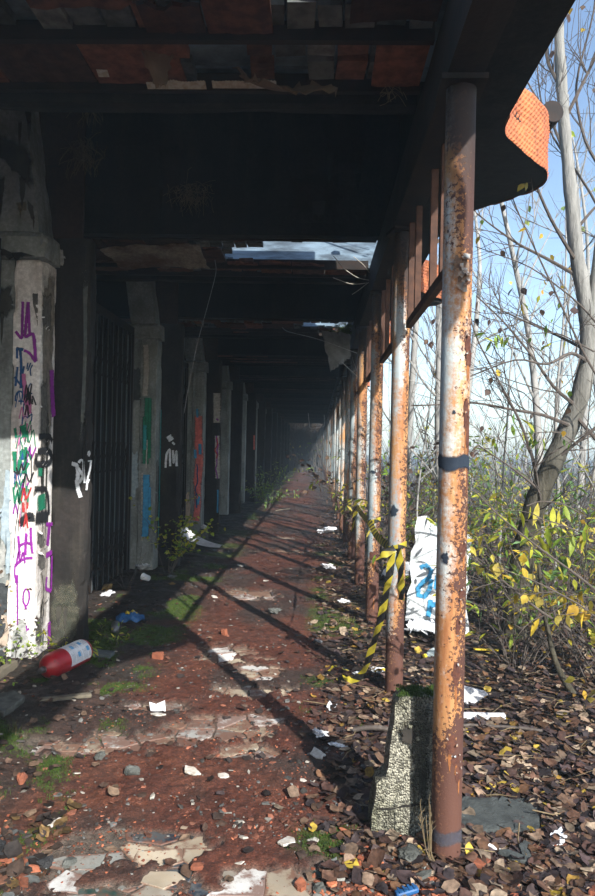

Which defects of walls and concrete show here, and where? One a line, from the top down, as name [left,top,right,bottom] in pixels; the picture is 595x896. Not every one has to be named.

rust [465,332,473,381]
rust [464,396,472,493]
rust [458,542,468,571]
rust [455,587,465,646]
rust [452,662,460,708]
rust [446,735,462,795]
peeling [277,836,295,847]